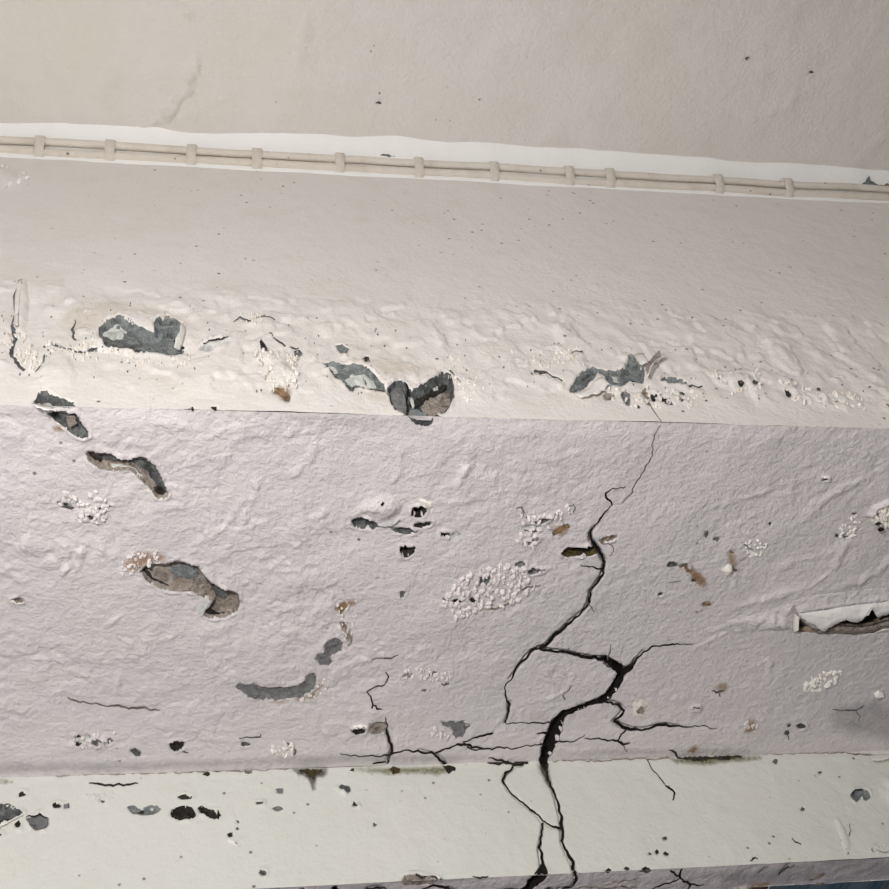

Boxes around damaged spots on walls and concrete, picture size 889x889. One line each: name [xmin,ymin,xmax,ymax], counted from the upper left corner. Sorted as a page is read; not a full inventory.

spalling [1,302,195,376]
spalling [305,335,490,426]
spalling [525,343,705,409]
spalling [32,391,88,439]
spalling [86,451,168,499]
spalling [121,550,240,619]
peeling [716,588,889,635]
peeling [236,638,343,703]
crack [340,402,717,889]
crack [68,697,160,711]
crack [89,780,138,788]
spalling [0,803,49,836]